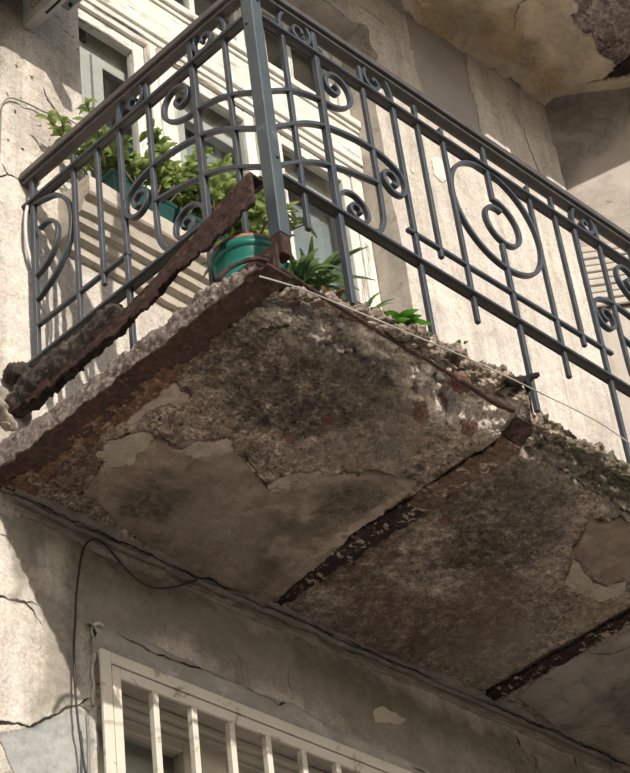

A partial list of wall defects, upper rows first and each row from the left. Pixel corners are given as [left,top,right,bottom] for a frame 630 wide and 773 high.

spalling [358,23,378,61]
spalling [216,256,270,282]
spalling [281,267,516,413]
spalling [413,401,430,424]
spalling [460,418,478,437]
crack [0,595,43,626]
crack [0,698,90,728]
peeling [373,706,406,724]